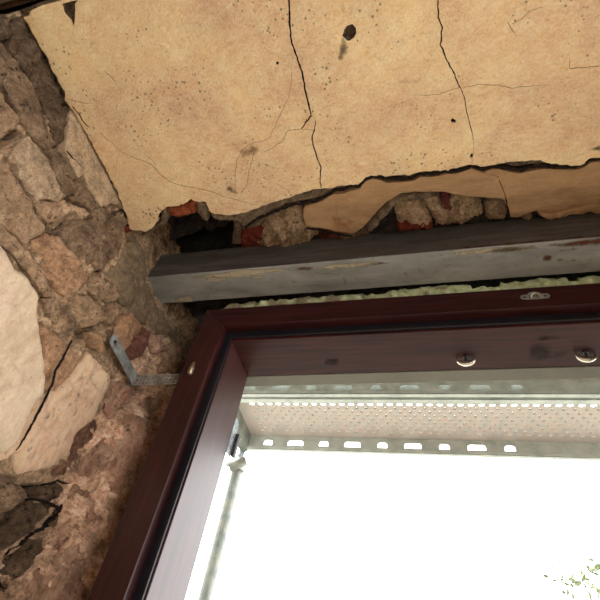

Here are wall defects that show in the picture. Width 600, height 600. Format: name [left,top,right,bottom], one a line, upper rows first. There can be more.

hole [63,0,77,25]
crack [102,0,600,237]
spalling [142,160,600,248]
spalling [0,14,199,600]
crack [16,340,72,451]
crack [4,479,68,556]